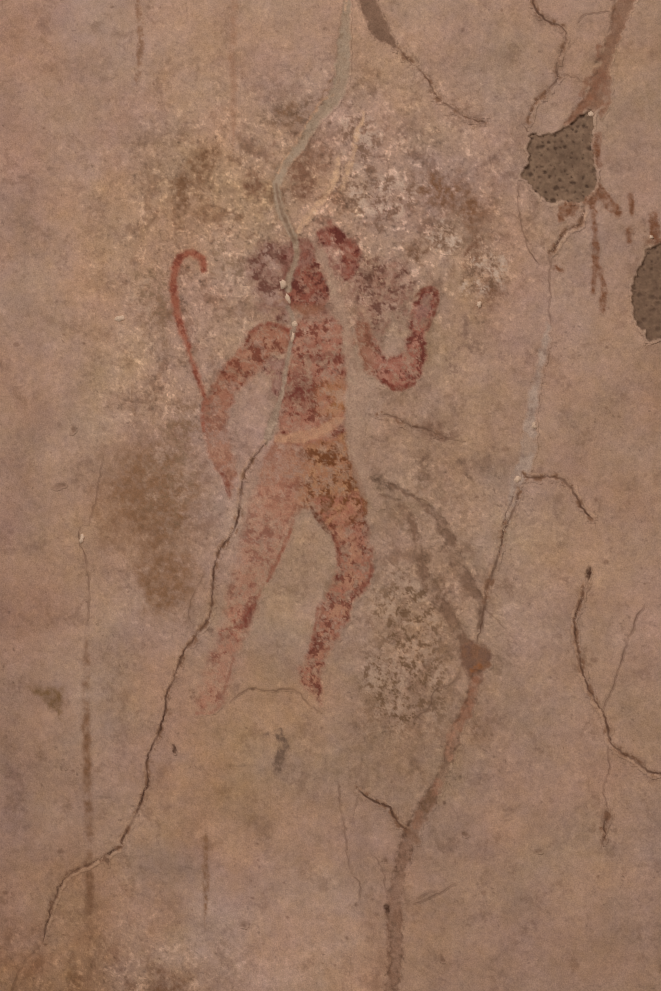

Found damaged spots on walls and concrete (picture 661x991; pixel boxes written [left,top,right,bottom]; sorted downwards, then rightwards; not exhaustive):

crack [392,43,489,126]
crack [523,0,610,135]
flaking render [517,105,600,208]
crack [508,185,590,326]
flaking render [629,235,661,346]
crack [476,468,598,644]
crack [10,437,272,991]
crack [229,687,322,714]
crack [412,667,462,726]
crack [568,580,661,849]
crack [337,781,412,901]
crack [413,883,457,905]